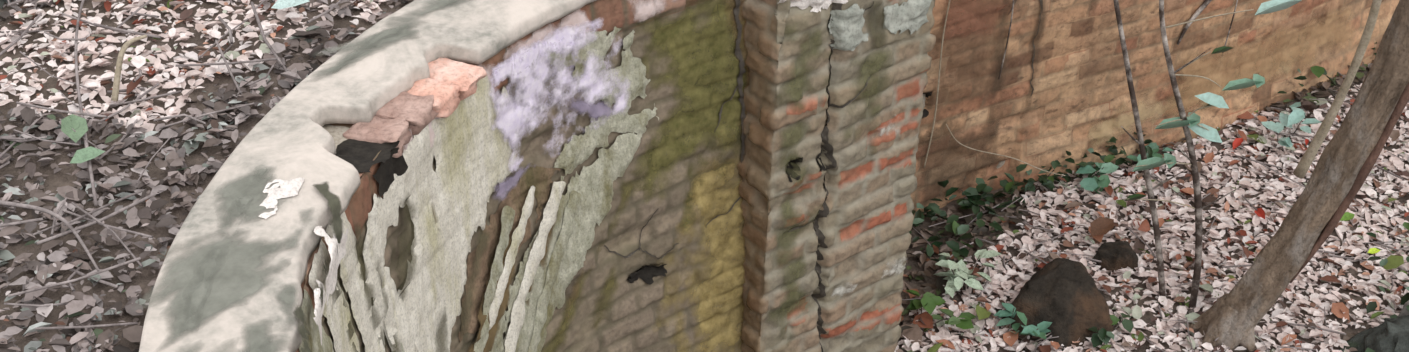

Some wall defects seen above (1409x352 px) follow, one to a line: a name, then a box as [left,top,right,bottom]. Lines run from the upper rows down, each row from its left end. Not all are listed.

damp [479,10,590,87]
peeling [778,0,932,51]
peeling [238,177,348,352]
flaking render [336,27,659,352]
crack [788,1,874,352]